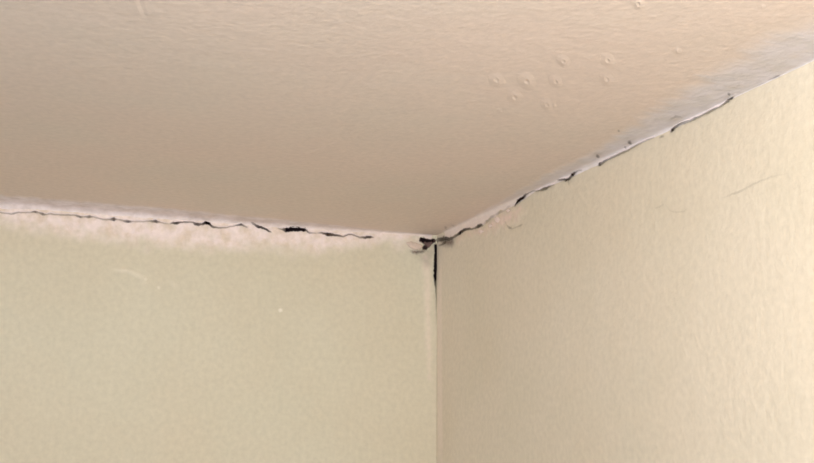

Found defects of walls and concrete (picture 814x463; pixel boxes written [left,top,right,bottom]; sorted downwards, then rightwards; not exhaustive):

crack [514,96,734,206]
crack [0,210,373,239]
crack [431,244,439,287]